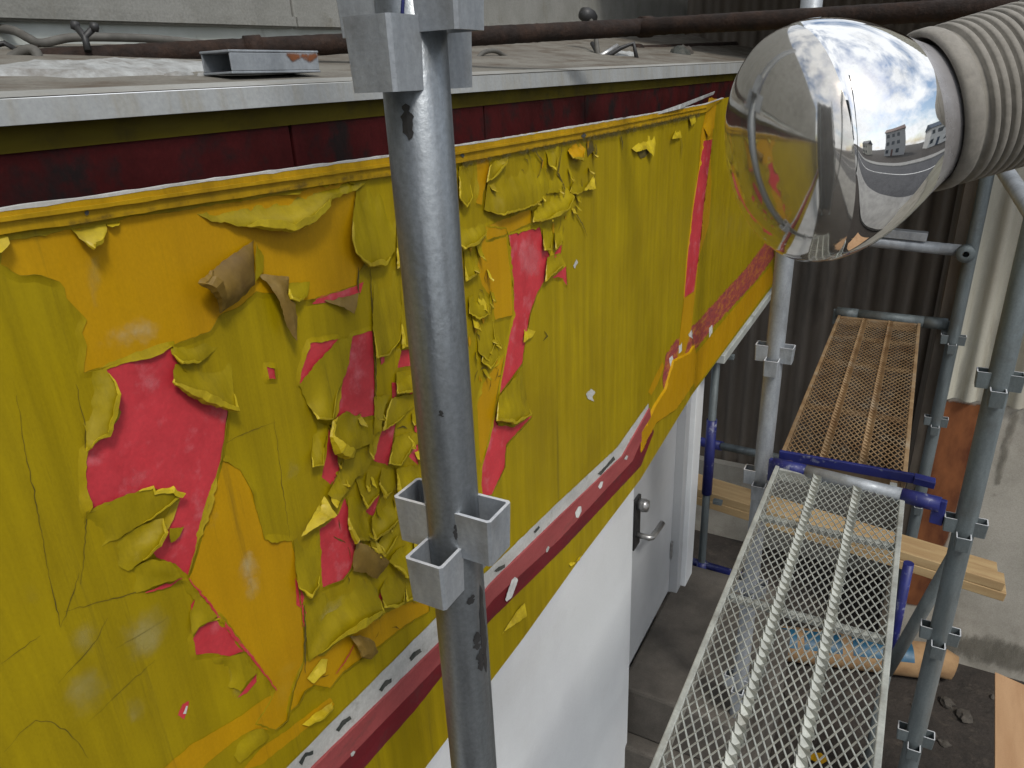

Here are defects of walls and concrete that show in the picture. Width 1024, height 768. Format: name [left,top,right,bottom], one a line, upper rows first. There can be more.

crack [1,395,164,678]
peeling [0,179,431,768]
peeling [459,141,599,496]
peeling [632,136,656,159]
peeling [641,97,774,452]